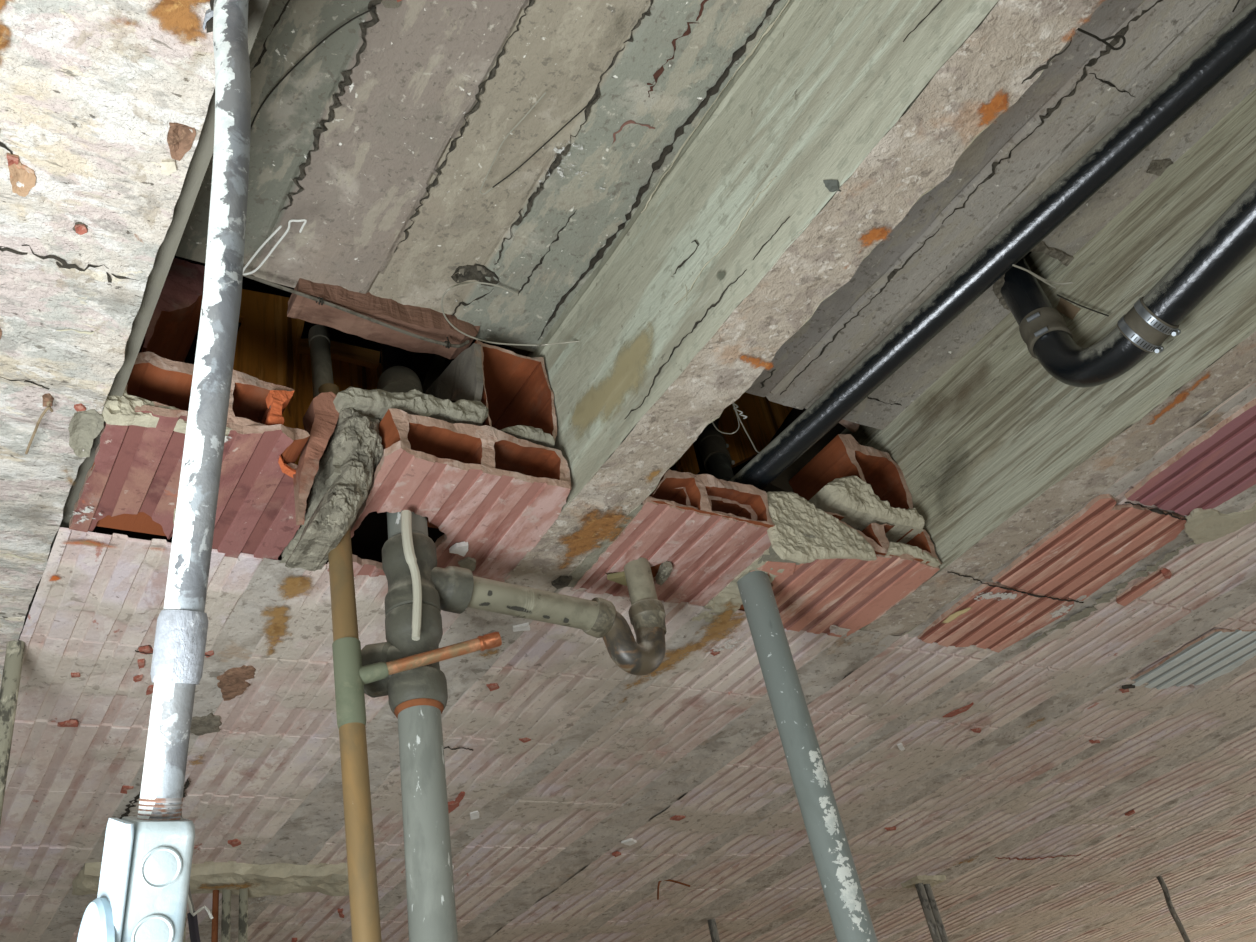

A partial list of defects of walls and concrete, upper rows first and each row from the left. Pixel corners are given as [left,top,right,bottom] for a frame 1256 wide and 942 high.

corrosion [0,0,11,63]
corrosion [150,0,210,42]
crack [281,0,382,211]
crack [452,0,790,340]
crack [760,0,1163,395]
crack [0,245,138,283]
spalling [68,403,104,458]
spalling [265,390,294,425]
corrosion [559,507,630,569]
spalling [551,576,572,589]
spalling [1026,541,1195,648]
corrosion [622,602,745,703]